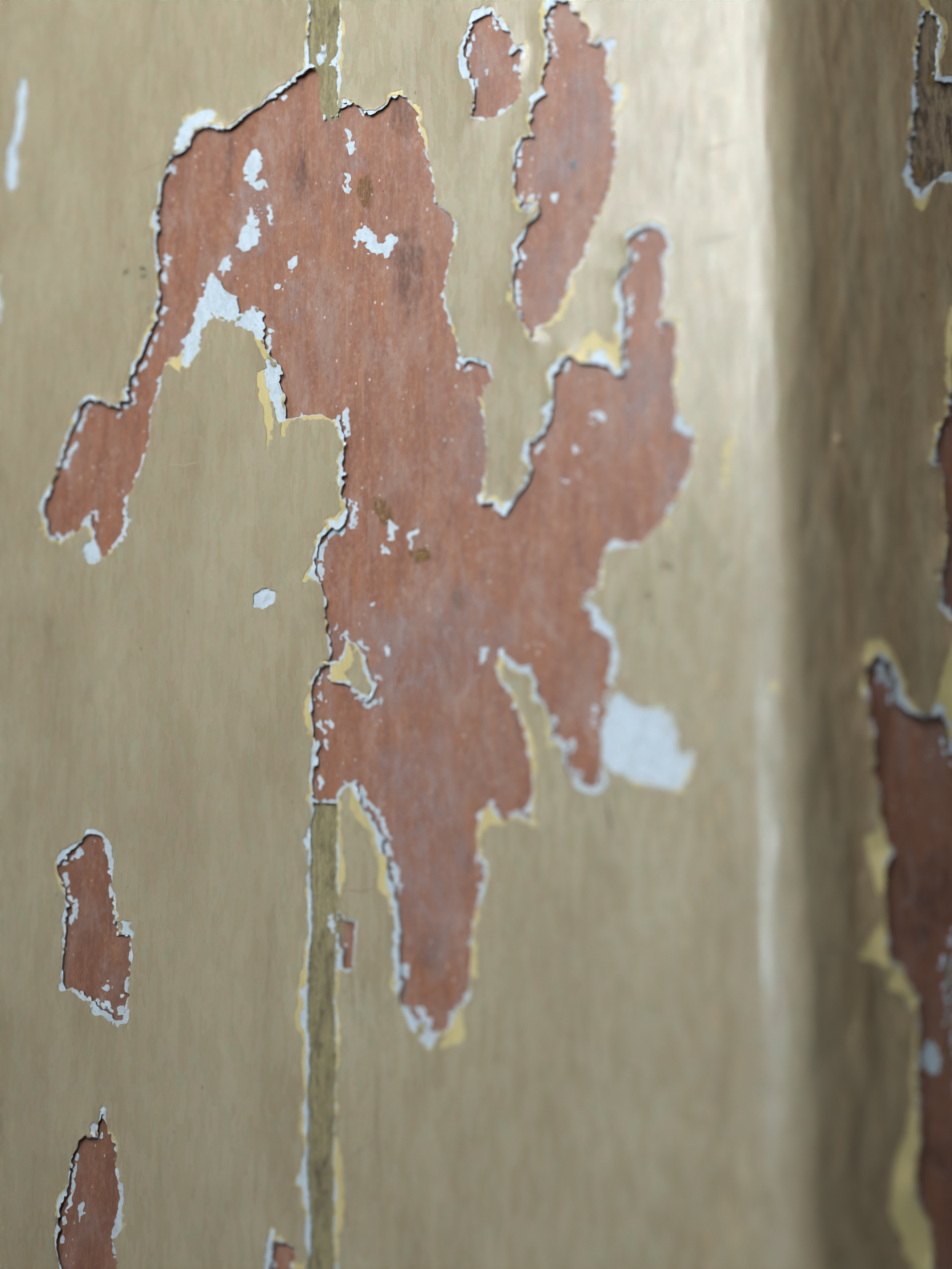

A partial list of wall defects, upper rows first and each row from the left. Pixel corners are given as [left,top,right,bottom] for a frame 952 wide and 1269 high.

peeling [901,0,952,211]
peeling [37,0,700,1051]
peeling [927,304,952,621]
peeling [857,637,952,1269]
peeling [52,1104,126,1269]
peeling [264,1227,301,1269]